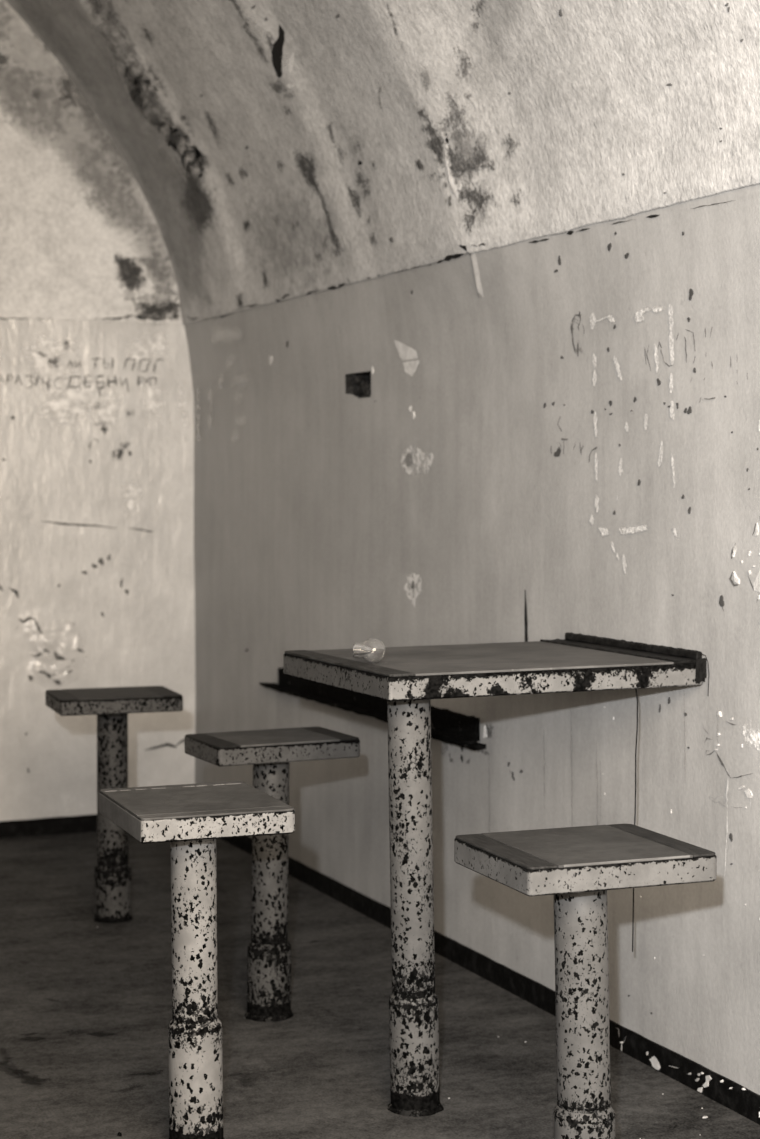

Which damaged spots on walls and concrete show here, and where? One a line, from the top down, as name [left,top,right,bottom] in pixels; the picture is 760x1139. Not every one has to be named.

leakage [415,95,495,232]
leakage [184,170,213,230]
leakage [114,255,180,321]
spalling [345,366,374,398]
peeling [394,340,420,377]
peeling [729,543,760,600]
peeling [646,1052,746,1092]